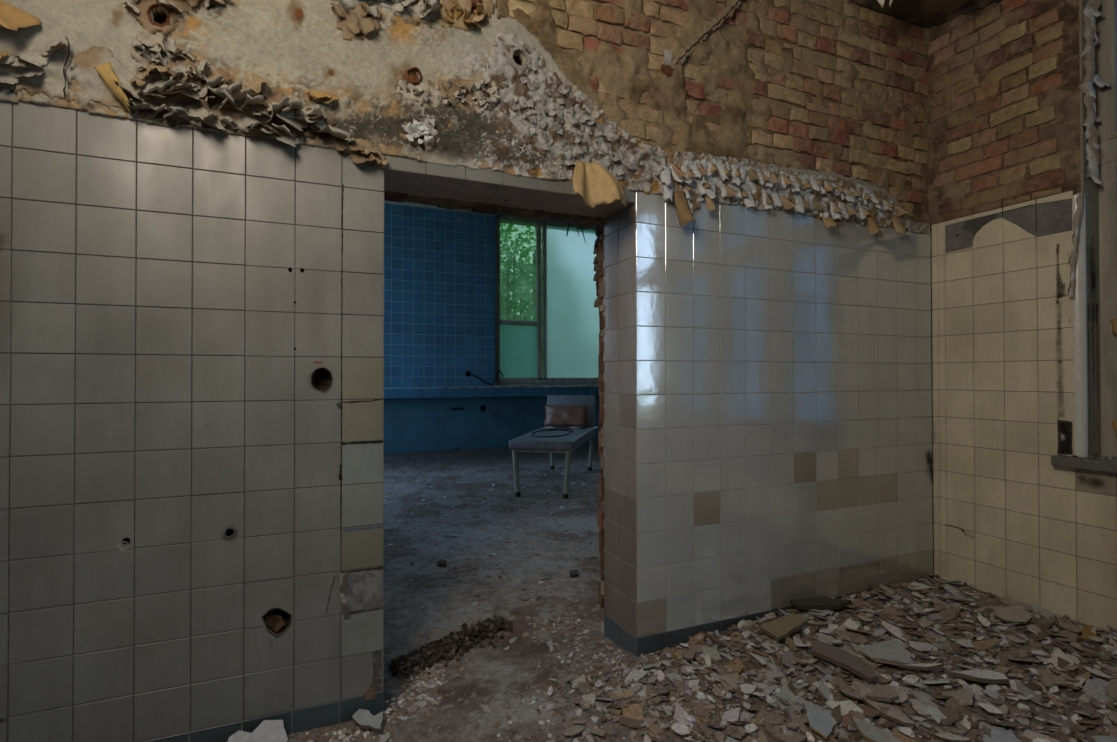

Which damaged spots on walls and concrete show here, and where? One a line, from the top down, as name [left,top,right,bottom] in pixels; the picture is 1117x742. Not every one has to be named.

peeling [0,0,389,171]
flaking render [330,0,1111,622]
spalling [261,608,292,638]